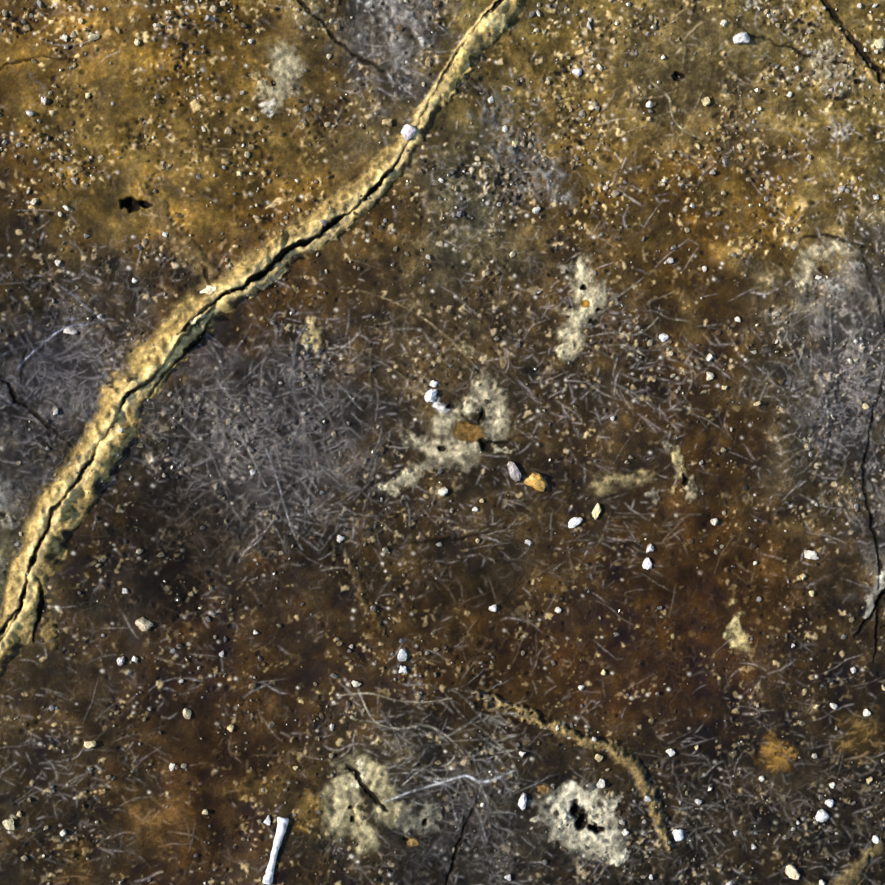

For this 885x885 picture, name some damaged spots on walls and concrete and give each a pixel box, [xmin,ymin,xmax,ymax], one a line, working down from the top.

crack [730,0,885,102]
crack [0,0,526,672]
crack [802,233,885,318]
crack [858,379,885,657]